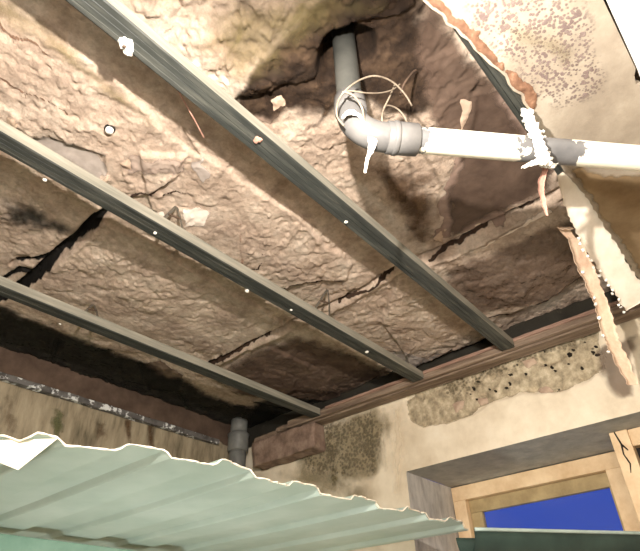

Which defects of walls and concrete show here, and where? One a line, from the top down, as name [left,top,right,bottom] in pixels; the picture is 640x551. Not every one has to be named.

leakage [473,0,600,102]
crack [505,197,540,214]
crack [2,208,107,287]
crack [428,220,490,262]
crack [338,266,395,303]
spalling [407,227,639,428]
leakage [503,298,596,339]
leakage [604,291,618,303]
leakage [0,306,303,448]
leakage [228,339,404,409]
leakage [416,339,494,371]
leakage [600,346,630,396]